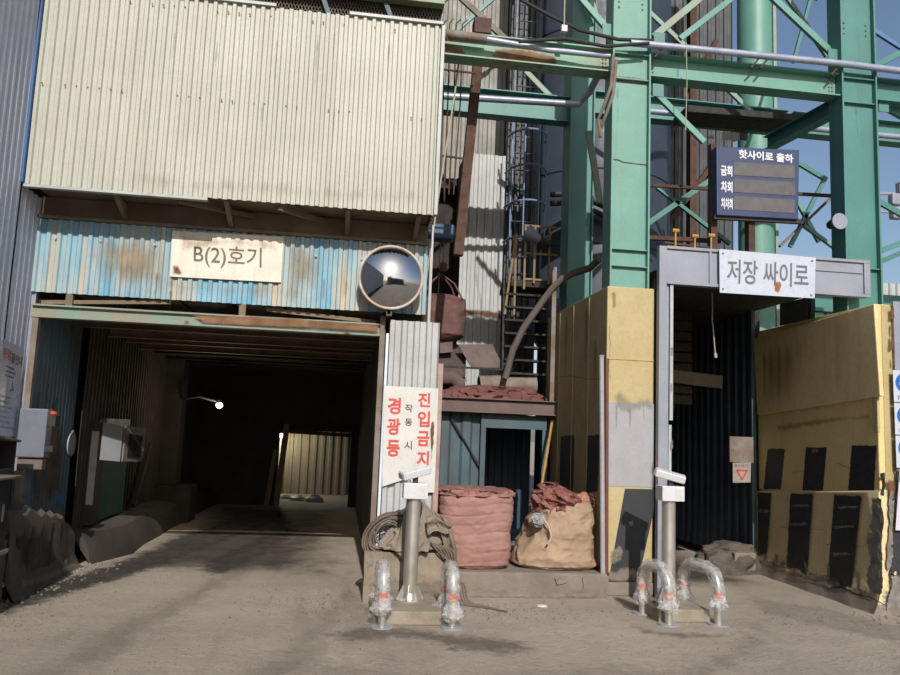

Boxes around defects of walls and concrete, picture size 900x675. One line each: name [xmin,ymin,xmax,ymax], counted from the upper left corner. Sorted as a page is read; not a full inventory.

rust [444,46,466,59]
rust [493,49,556,64]
rust [466,310,501,319]
spalling [865,472,900,610]